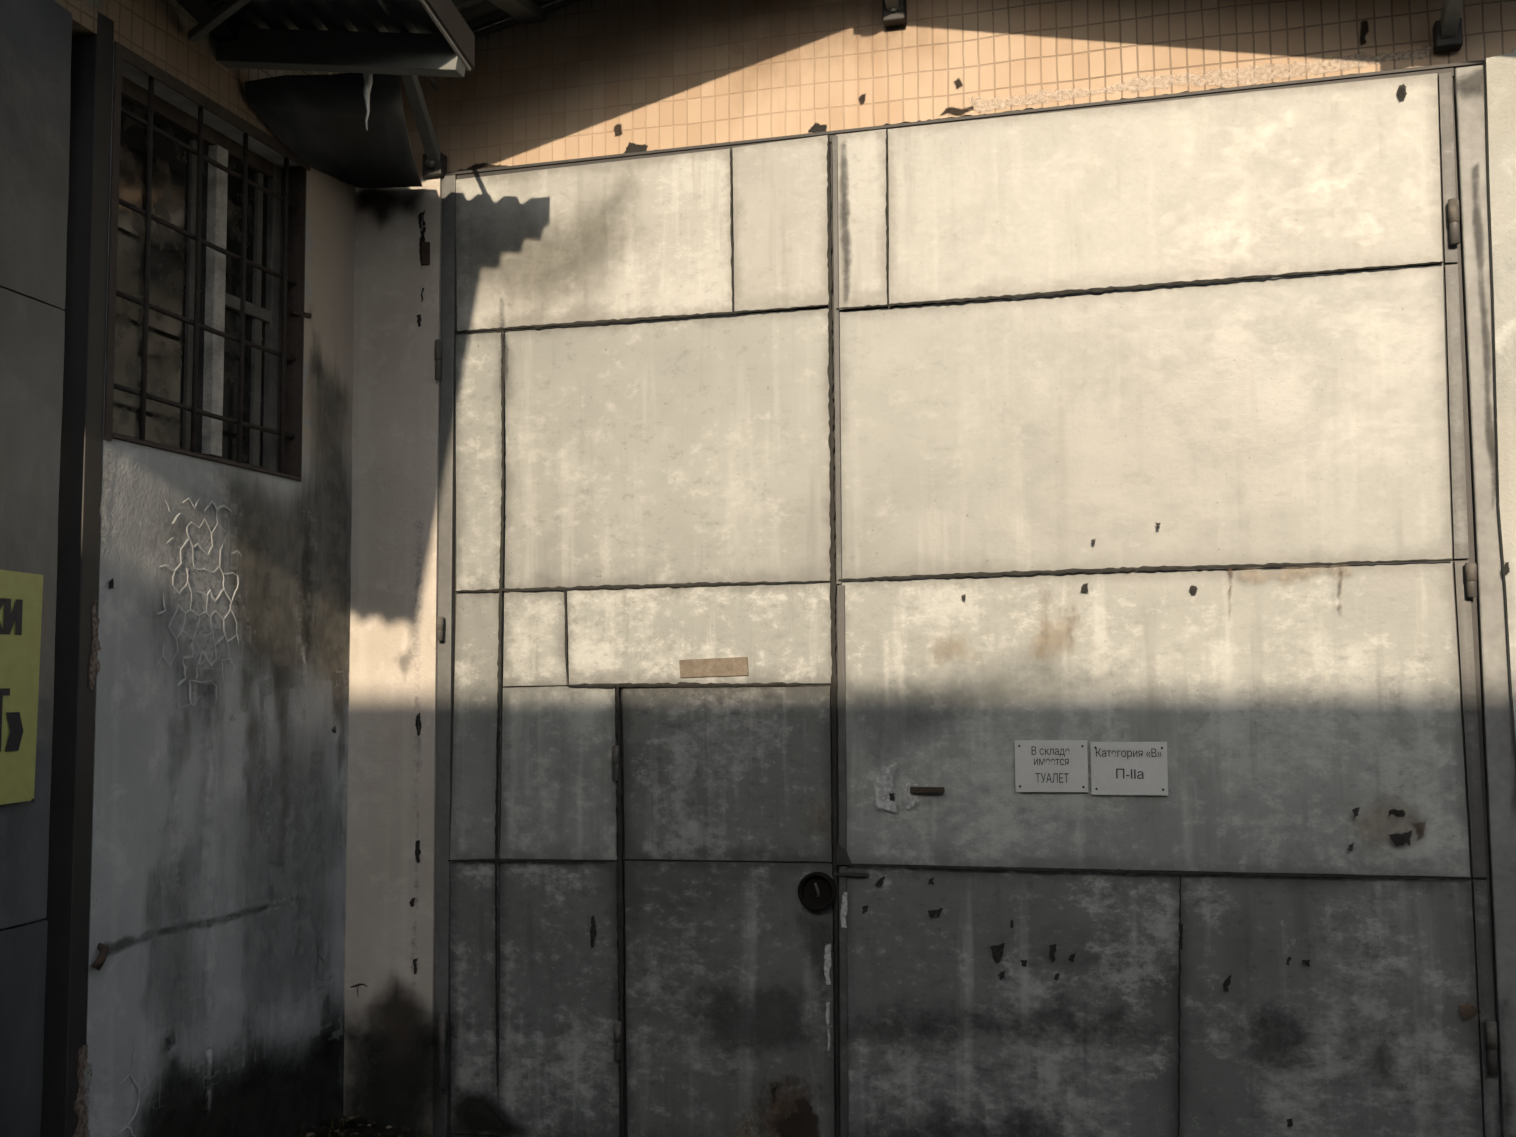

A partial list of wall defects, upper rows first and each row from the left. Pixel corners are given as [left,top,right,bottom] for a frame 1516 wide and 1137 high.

water stain [229,358,352,1003]
water stain [155,516,222,1034]
corrosion [1388,809,1425,846]
water stain [139,982,454,1137]
corrosion [746,1077,819,1137]